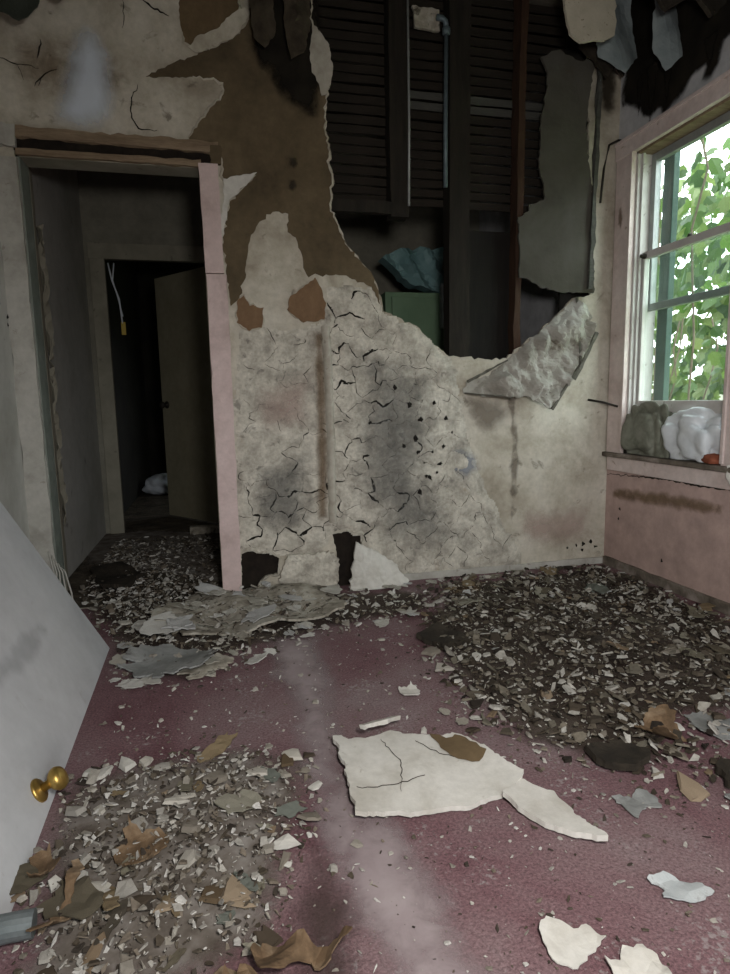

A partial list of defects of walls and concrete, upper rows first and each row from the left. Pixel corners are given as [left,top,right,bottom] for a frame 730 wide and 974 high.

crack [3,40,57,86]
crack [130,84,157,131]
peeling [146,0,380,331]
damp [473,398,518,495]
crack [607,473,730,491]
spalling [241,547,281,589]
spalling [332,528,364,602]